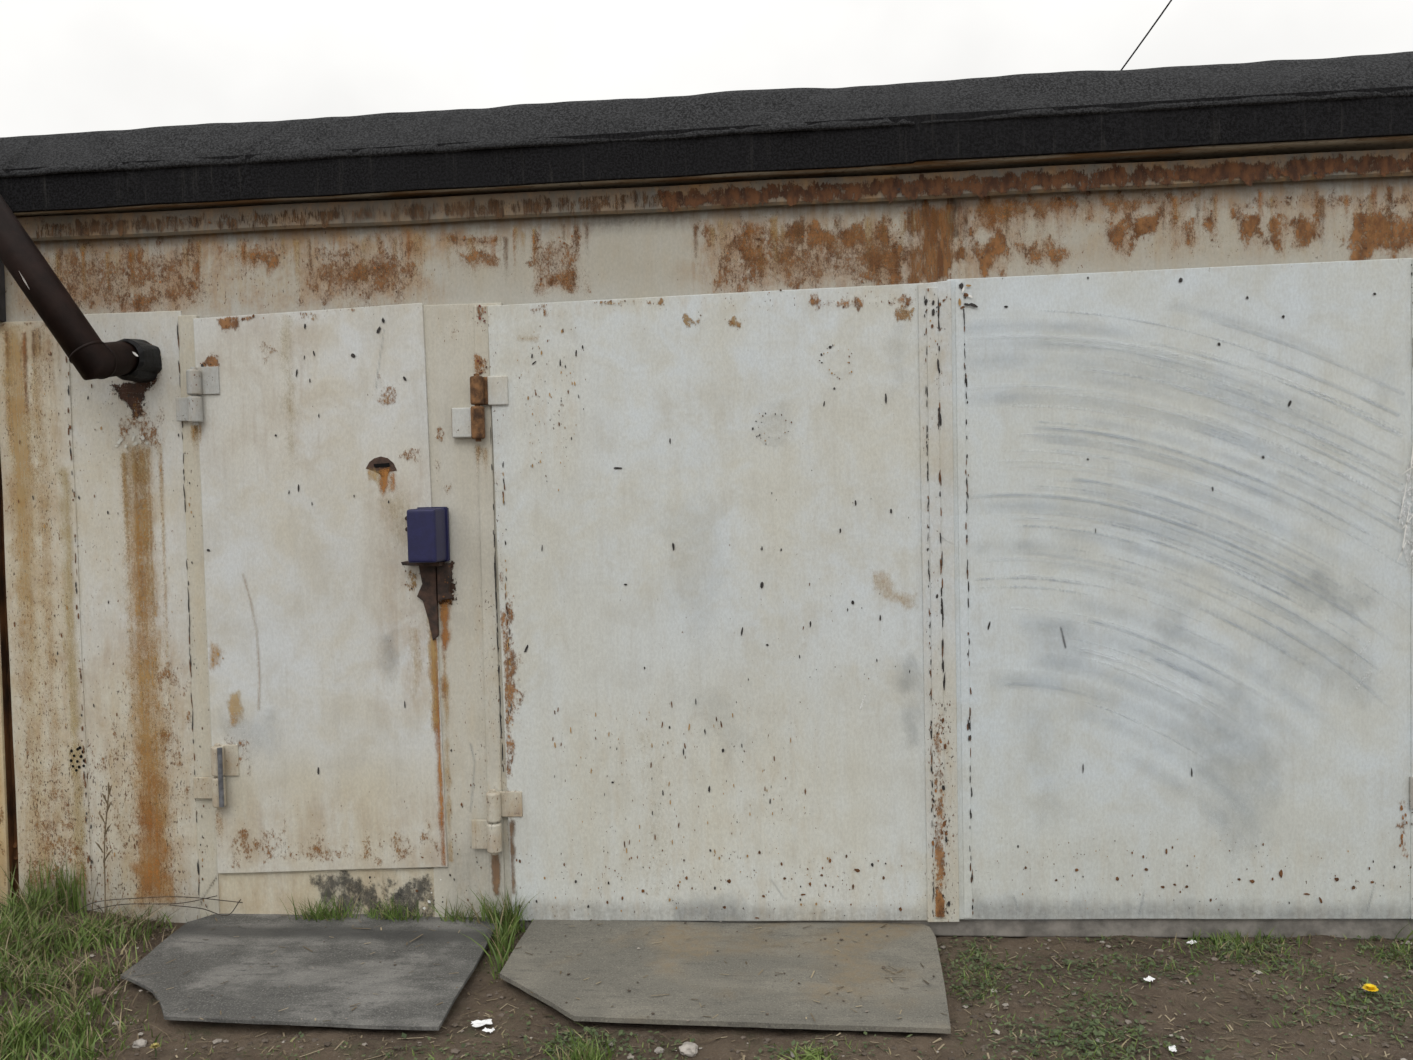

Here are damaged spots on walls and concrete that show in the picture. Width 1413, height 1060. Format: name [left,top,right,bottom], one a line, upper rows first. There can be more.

corrosion [36,152,1413,347]
corrosion [200,355,219,367]
corrosion [368,448,419,493]
corrosion [517,327,584,440]
corrosion [101,376,191,900]
corrosion [232,561,481,901]
leakage [312,871,443,917]
corrosion [500,575,523,792]
corrosion [918,714,950,918]